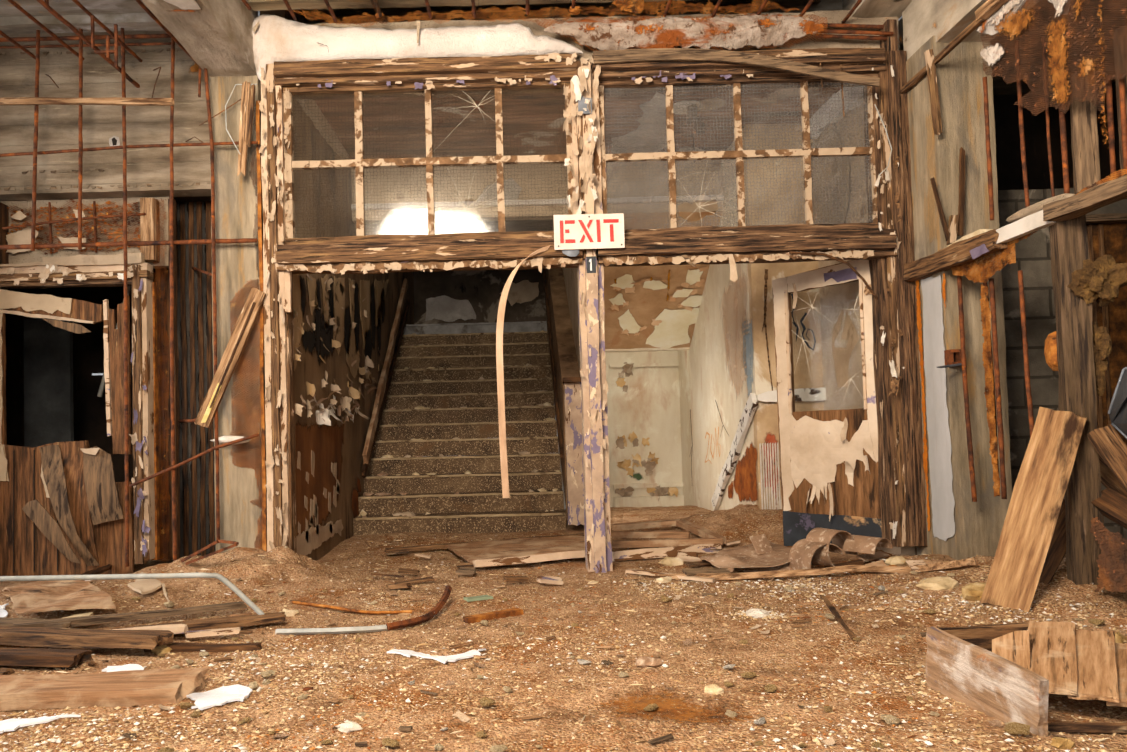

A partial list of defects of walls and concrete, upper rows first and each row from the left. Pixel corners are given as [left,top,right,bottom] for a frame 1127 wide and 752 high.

corrosion [579,24,663,43]
peeling [386,81,435,90]
peeling [259,66,299,221]
peeling [495,52,704,214]
peeling [875,156,902,254]
peeling [500,280,539,306]
peeling [609,257,717,349]
peeling [880,326,905,397]
spalling [263,263,398,556]
peeling [840,417,848,444]
peeling [843,455,871,475]
peeling [806,483,833,521]